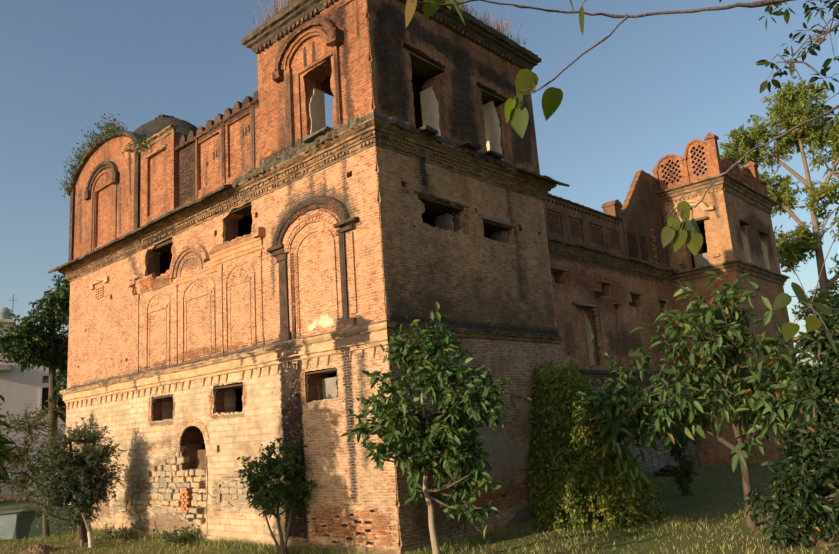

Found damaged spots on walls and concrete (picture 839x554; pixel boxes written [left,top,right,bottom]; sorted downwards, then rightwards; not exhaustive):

flaking render [291,245,335,334]
leakage [65,322,312,541]
spalling [312,505,394,546]